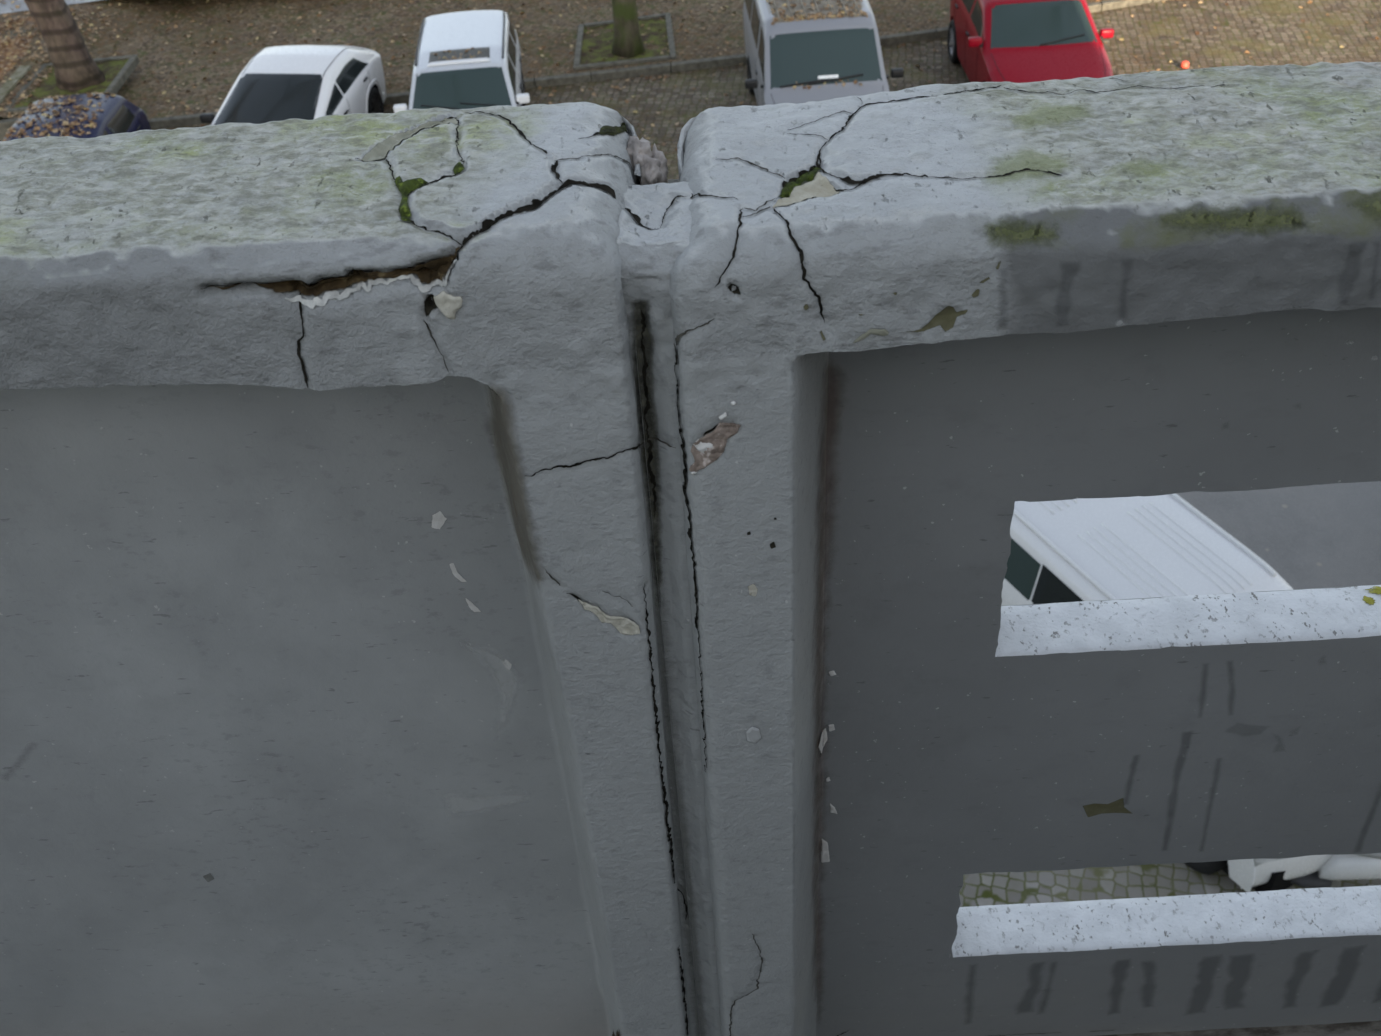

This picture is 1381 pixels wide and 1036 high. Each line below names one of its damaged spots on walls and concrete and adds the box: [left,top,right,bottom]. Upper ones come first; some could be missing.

spalling [578,122,669,185]
crack [297,293,308,388]
spalling [689,401,741,475]
crack [355,78,1219,767]
spalling [545,569,640,635]
crack [643,583,688,1034]
crack [729,934,763,1036]